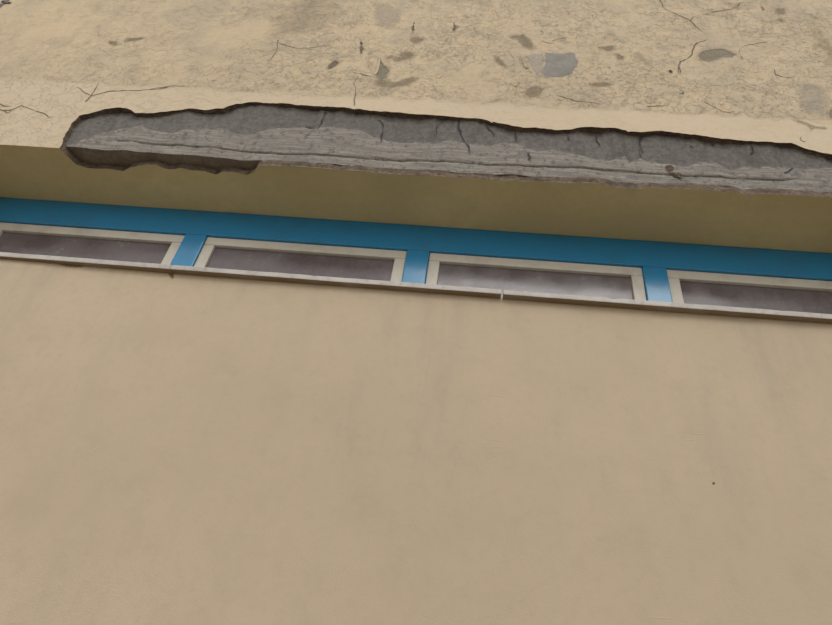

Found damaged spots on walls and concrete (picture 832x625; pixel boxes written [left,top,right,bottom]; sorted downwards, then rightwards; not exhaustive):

crack [660,0,744,74]
flaking render [510,34,533,69]
peeling [543,52,579,77]
flaking render [698,49,736,62]
crack [78,84,167,102]
flaking render [525,86,543,98]
spalling [60,101,832,198]